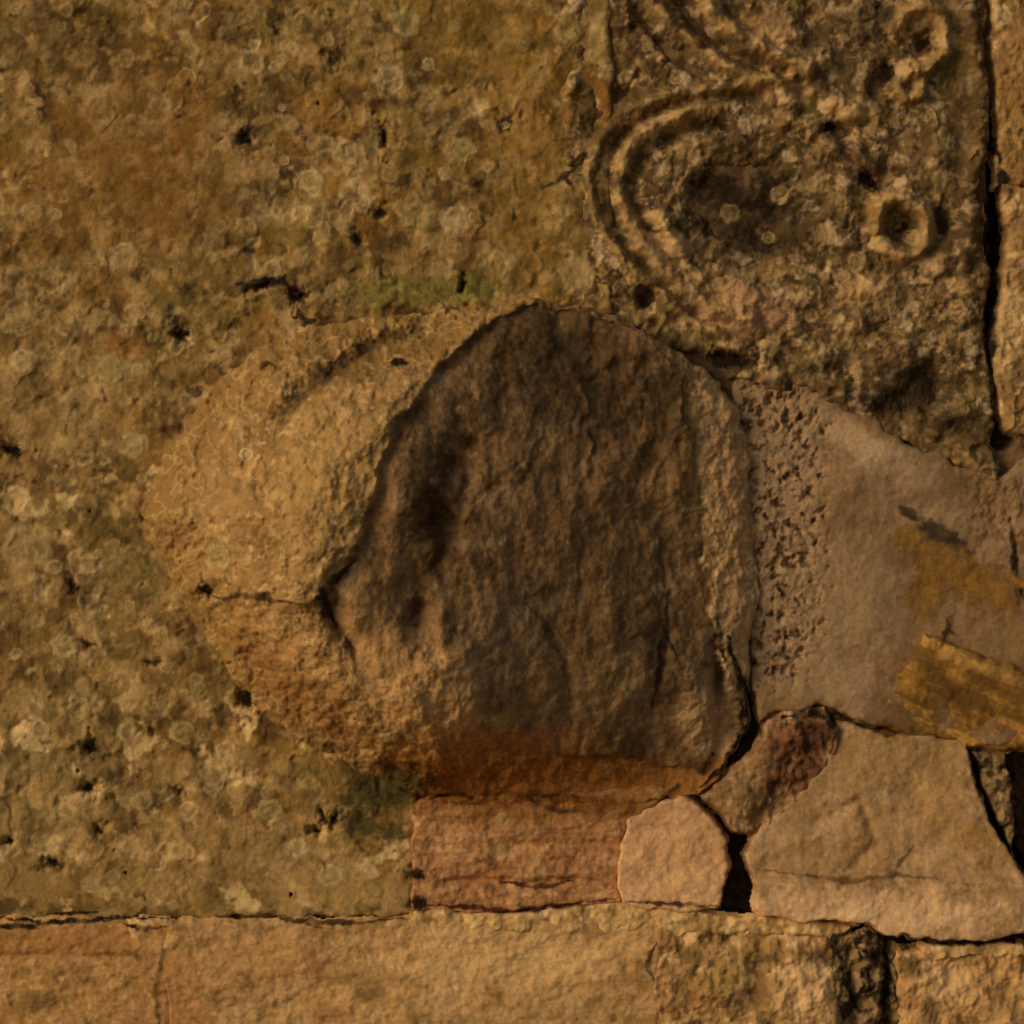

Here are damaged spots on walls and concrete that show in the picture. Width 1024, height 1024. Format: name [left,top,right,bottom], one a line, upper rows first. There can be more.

crack [216,561,355,660]